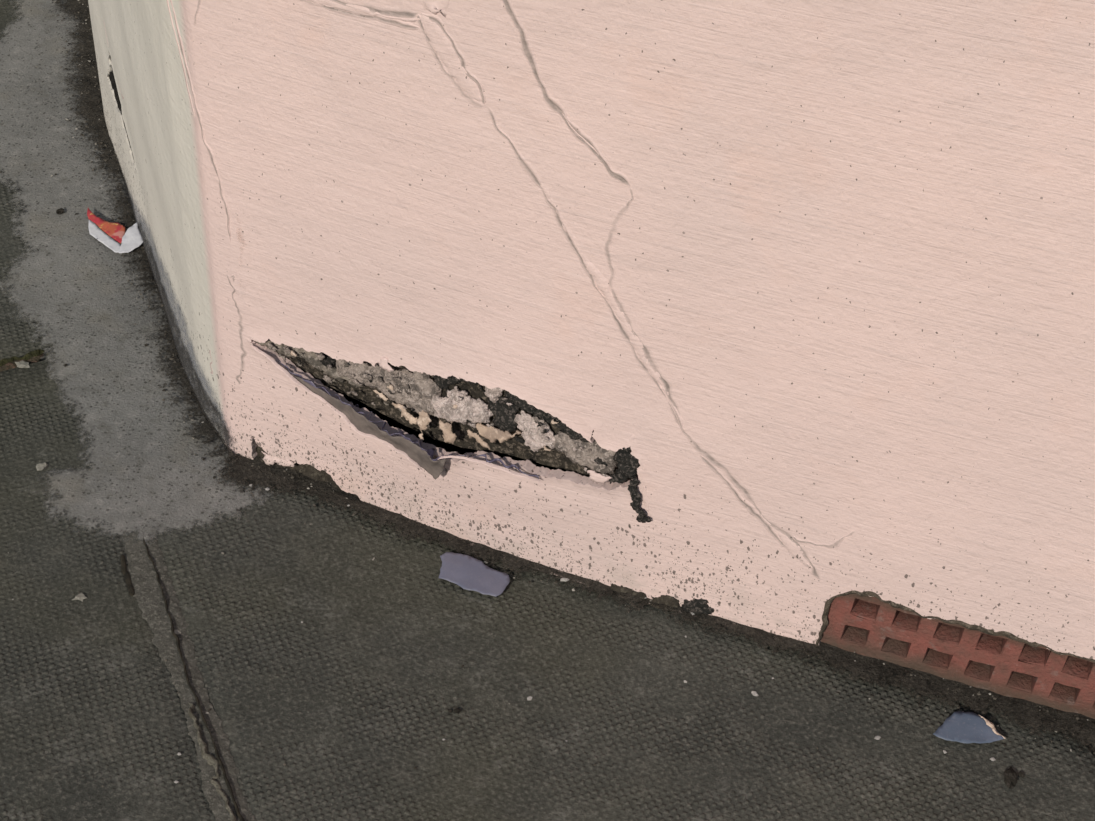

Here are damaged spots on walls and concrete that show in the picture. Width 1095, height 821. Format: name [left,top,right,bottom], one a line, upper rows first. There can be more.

crack [167,0,231,242]
crack [209,274,255,385]
crack [300,0,855,582]